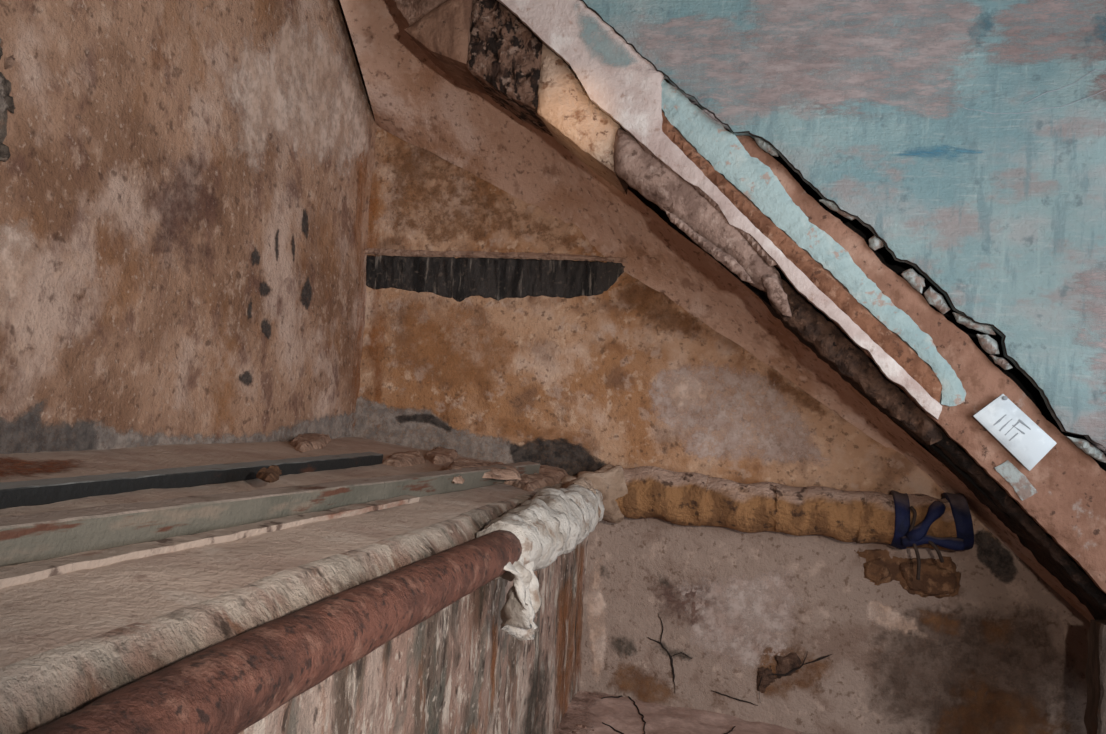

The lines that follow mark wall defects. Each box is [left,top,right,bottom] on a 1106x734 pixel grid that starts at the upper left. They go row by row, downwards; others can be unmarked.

spalling [0,38,16,162]
spalling [749,132,1106,463]
peeling [995,460,1038,501]
spalling [854,549,961,599]
crack [601,695,646,734]
crack [648,613,692,685]
crack [711,651,832,734]
spalling [756,652,802,693]